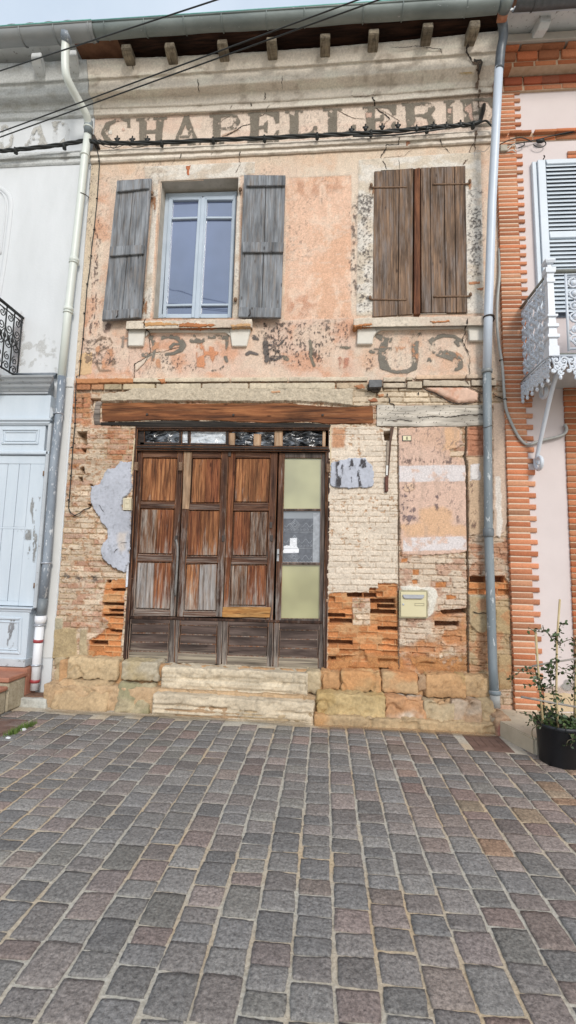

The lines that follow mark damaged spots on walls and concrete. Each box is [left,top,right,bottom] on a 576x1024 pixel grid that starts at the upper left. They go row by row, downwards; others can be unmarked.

crack [339,94,409,169]
crack [394,44,483,165]
peeling [231,194,373,368]
peeling [468,191,484,290]
peeling [76,322,219,385]
spalling [64,576,126,657]
spalling [327,583,467,672]
spalling [467,575,510,597]